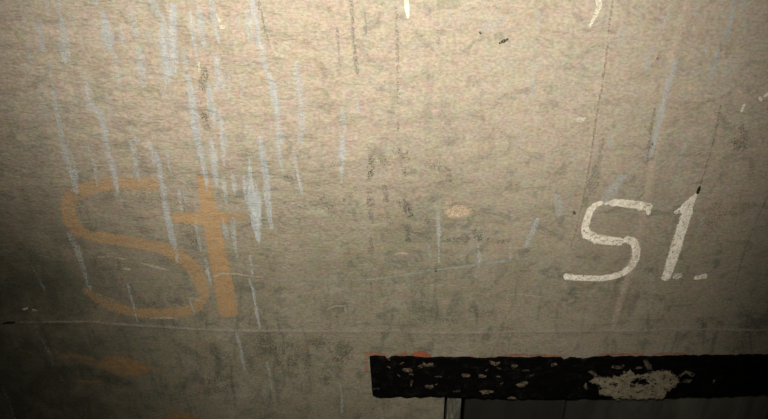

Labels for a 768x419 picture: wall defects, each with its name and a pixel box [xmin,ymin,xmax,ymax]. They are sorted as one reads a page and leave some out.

leakage [32,62,212,322]
leakage [92,0,307,244]
crack [571,1,613,246]
peeling [584,360,695,401]